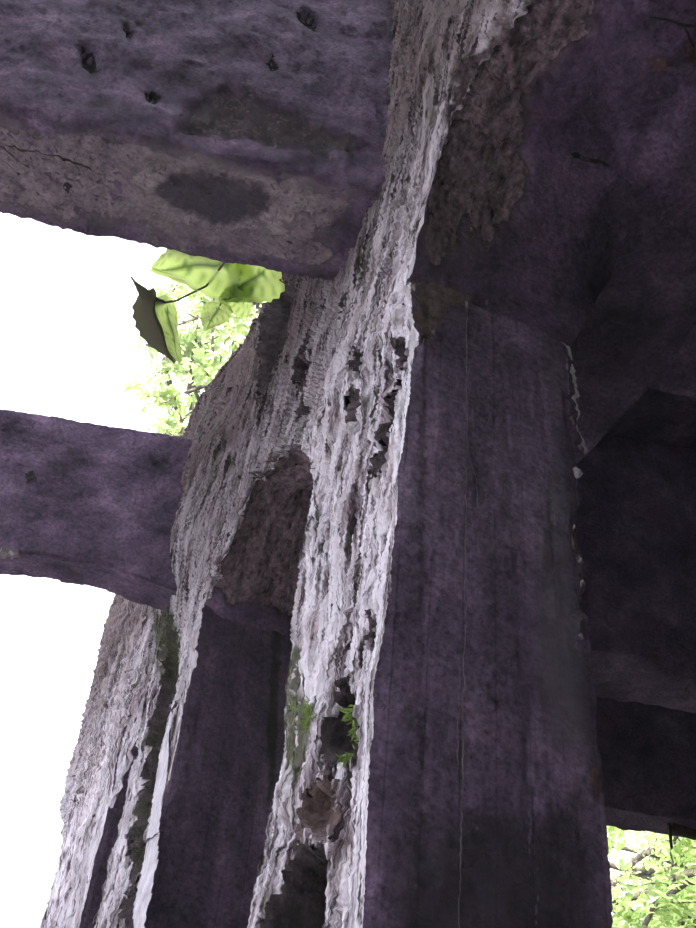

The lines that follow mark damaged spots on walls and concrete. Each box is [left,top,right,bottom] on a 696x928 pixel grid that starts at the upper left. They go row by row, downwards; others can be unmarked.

spalling [77,46,101,74]
spalling [296,7,317,32]
crack [649,17,696,63]
crack [0,142,104,175]
leakage [0,124,356,268]
peeling [349,695,361,772]
spalling [255,740,342,928]